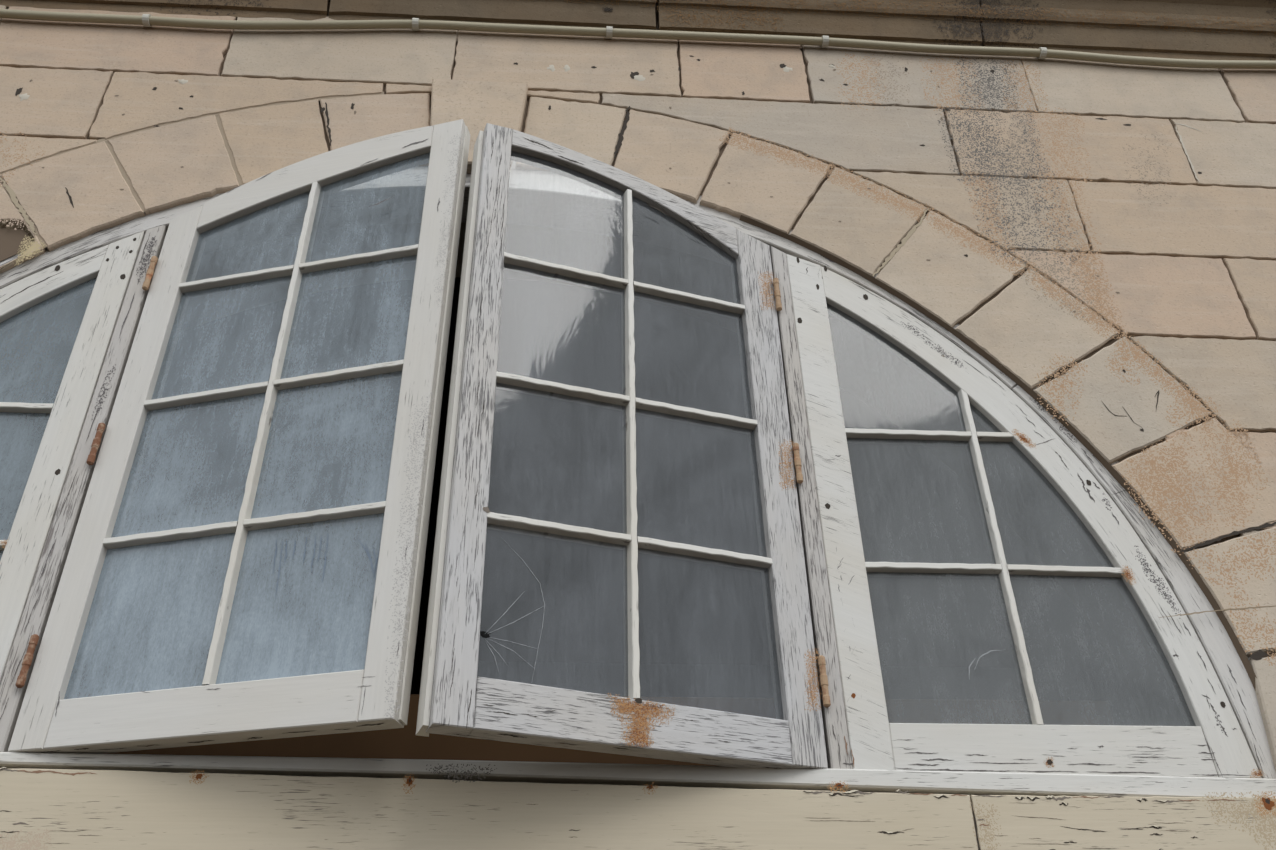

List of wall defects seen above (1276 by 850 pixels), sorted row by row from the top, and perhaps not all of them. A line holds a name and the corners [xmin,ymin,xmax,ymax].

spalling [7,235,47,278]
corrosion [606,693,675,748]
peeling [899,739,1163,773]
peeling [979,795,1071,806]